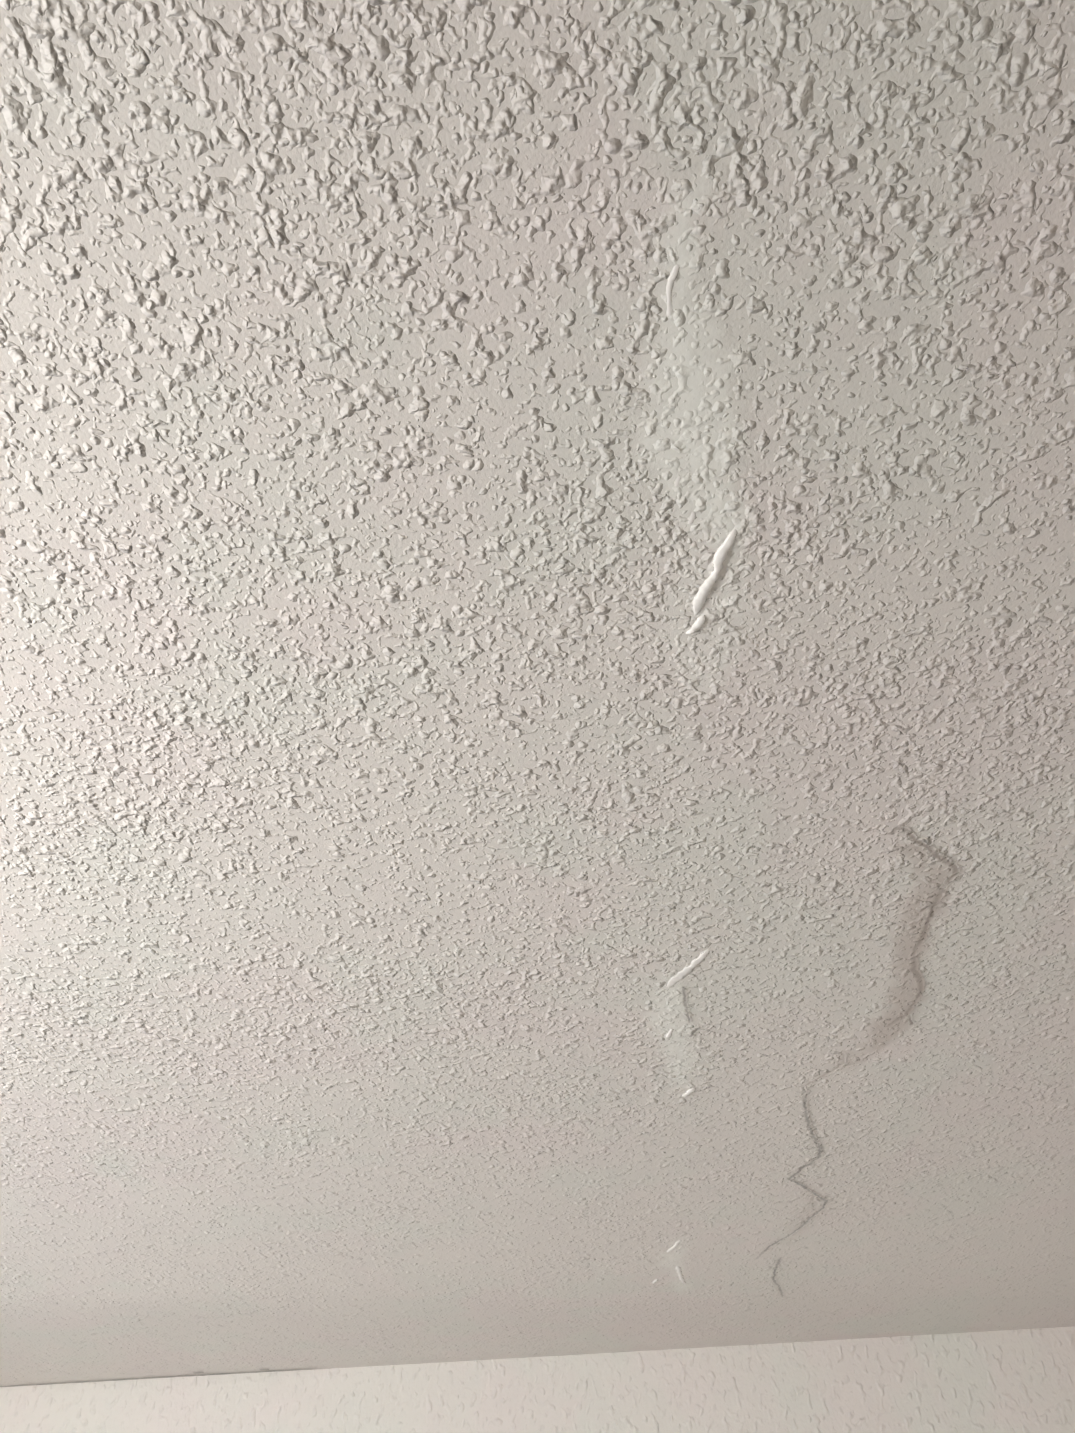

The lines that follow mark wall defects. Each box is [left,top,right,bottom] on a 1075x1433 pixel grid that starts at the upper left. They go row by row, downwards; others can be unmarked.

crack [755,826,975,1298]